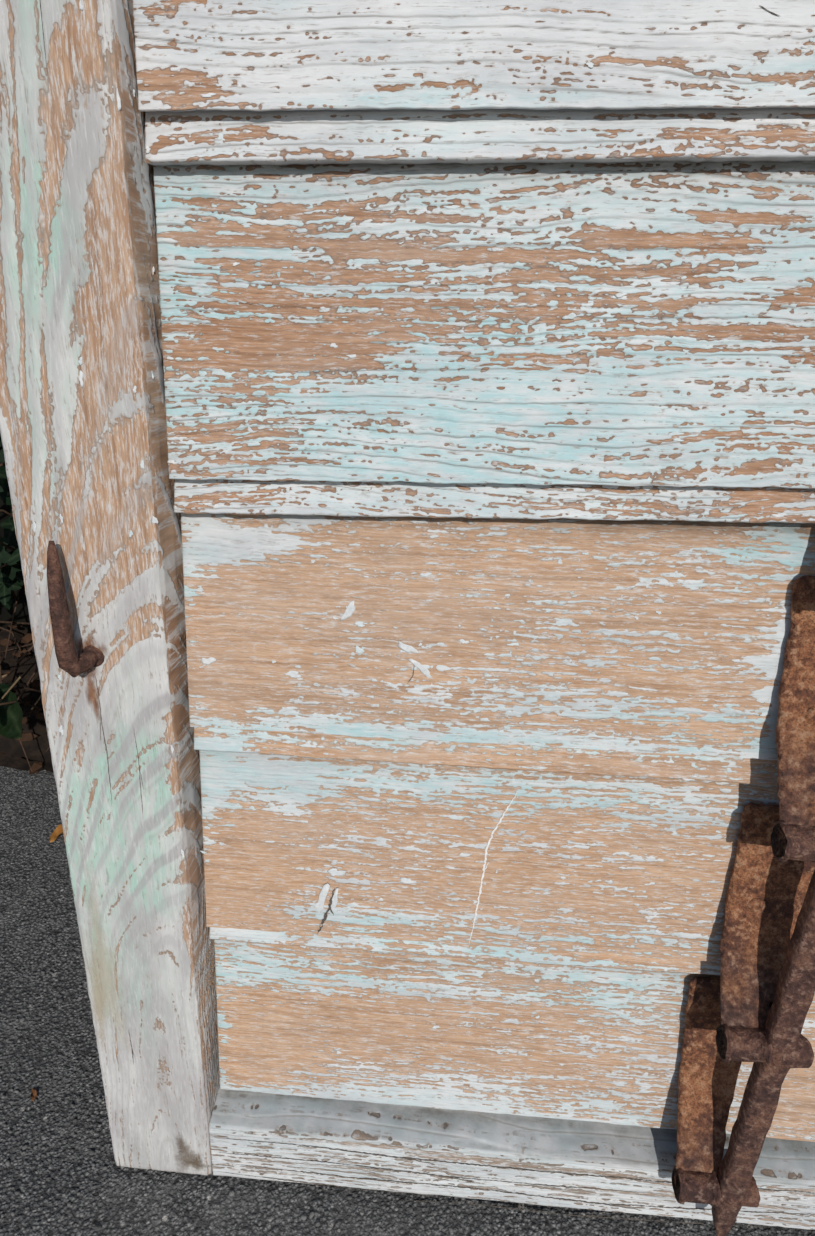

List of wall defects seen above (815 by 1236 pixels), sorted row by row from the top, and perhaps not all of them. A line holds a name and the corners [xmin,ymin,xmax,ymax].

peeling [222,50,319,71]
peeling [358,55,502,119]
peeling [508,46,815,122]
peeling [753,28,815,63]
peeling [239,147,370,186]
peeling [495,403,590,438]
rust [87,668,98,716]
peeling [32,609,111,842]
peeling [726,1062,754,1141]
peeling [766,994,815,1149]
peeling [196,1125,712,1216]
peeling [737,1169,815,1227]